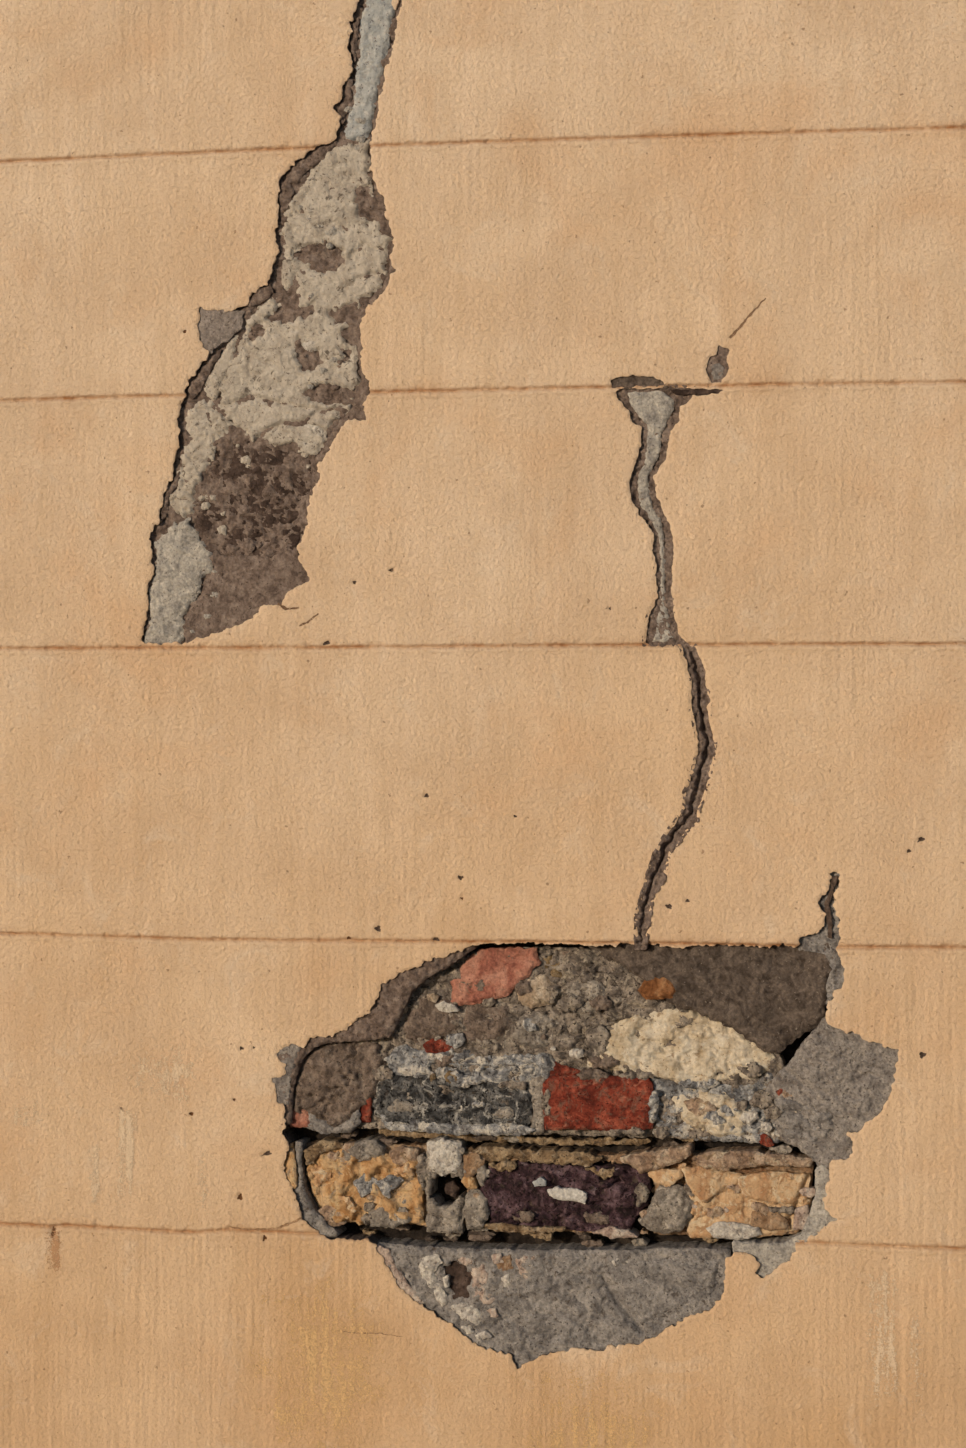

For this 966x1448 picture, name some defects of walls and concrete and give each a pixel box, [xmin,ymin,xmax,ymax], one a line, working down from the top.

crack [611,375,723,950]
flaking render [262,872,899,1369]